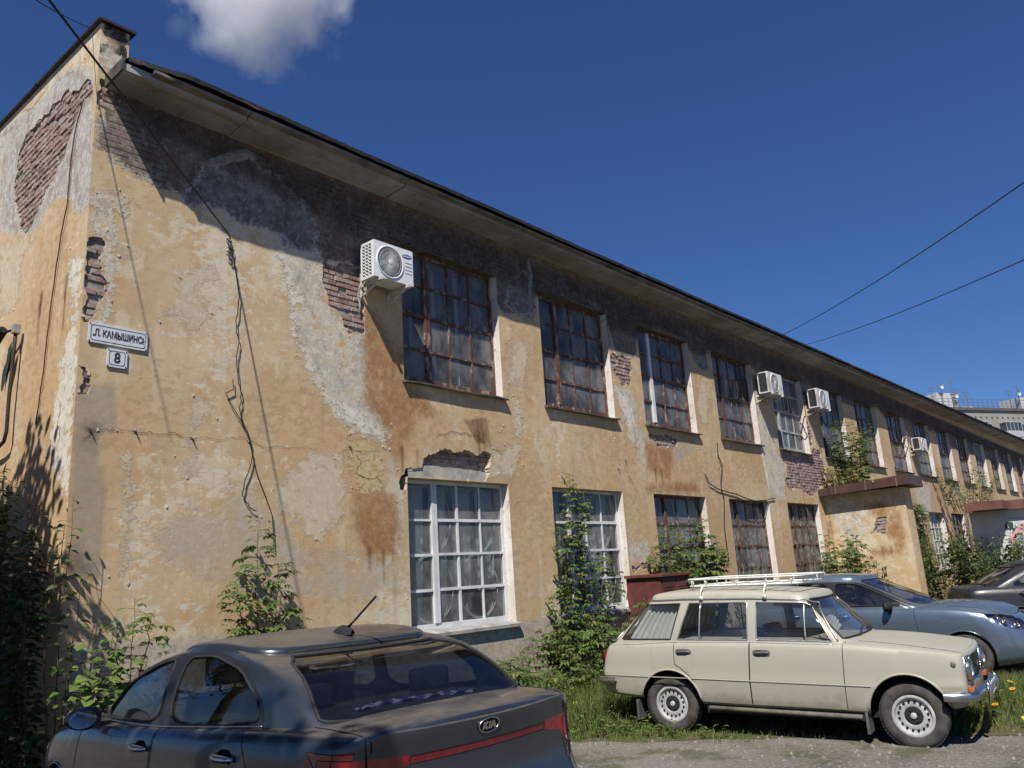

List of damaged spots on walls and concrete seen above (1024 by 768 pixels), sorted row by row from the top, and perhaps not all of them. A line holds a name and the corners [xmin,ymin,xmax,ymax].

flaking render [0,41,1024,602]
water stain [357,498,397,556]
flaking render [59,633,245,729]
flaking render [448,612,631,686]
flaking render [717,603,746,627]